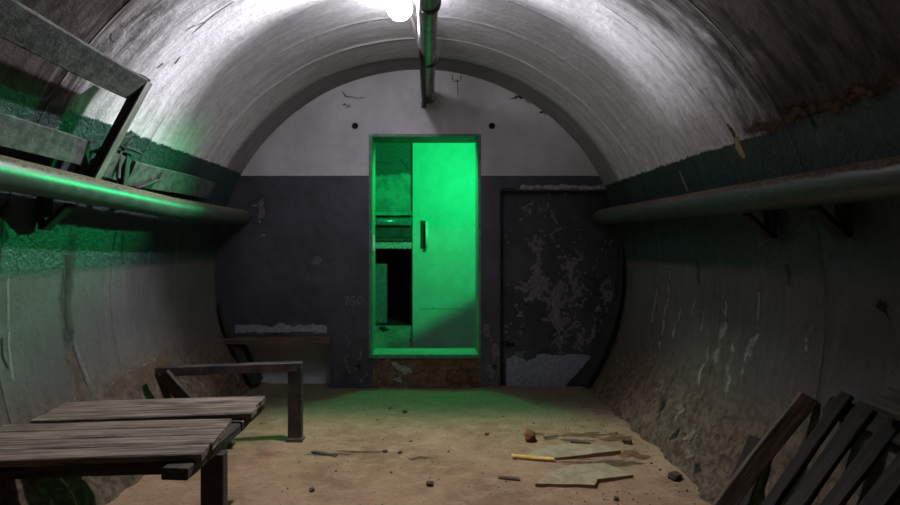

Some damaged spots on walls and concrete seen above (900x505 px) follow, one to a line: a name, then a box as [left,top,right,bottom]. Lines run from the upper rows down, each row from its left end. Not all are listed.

peeling [234,322,327,334]
peeling [492,184,614,387]
damp [698,291,760,391]